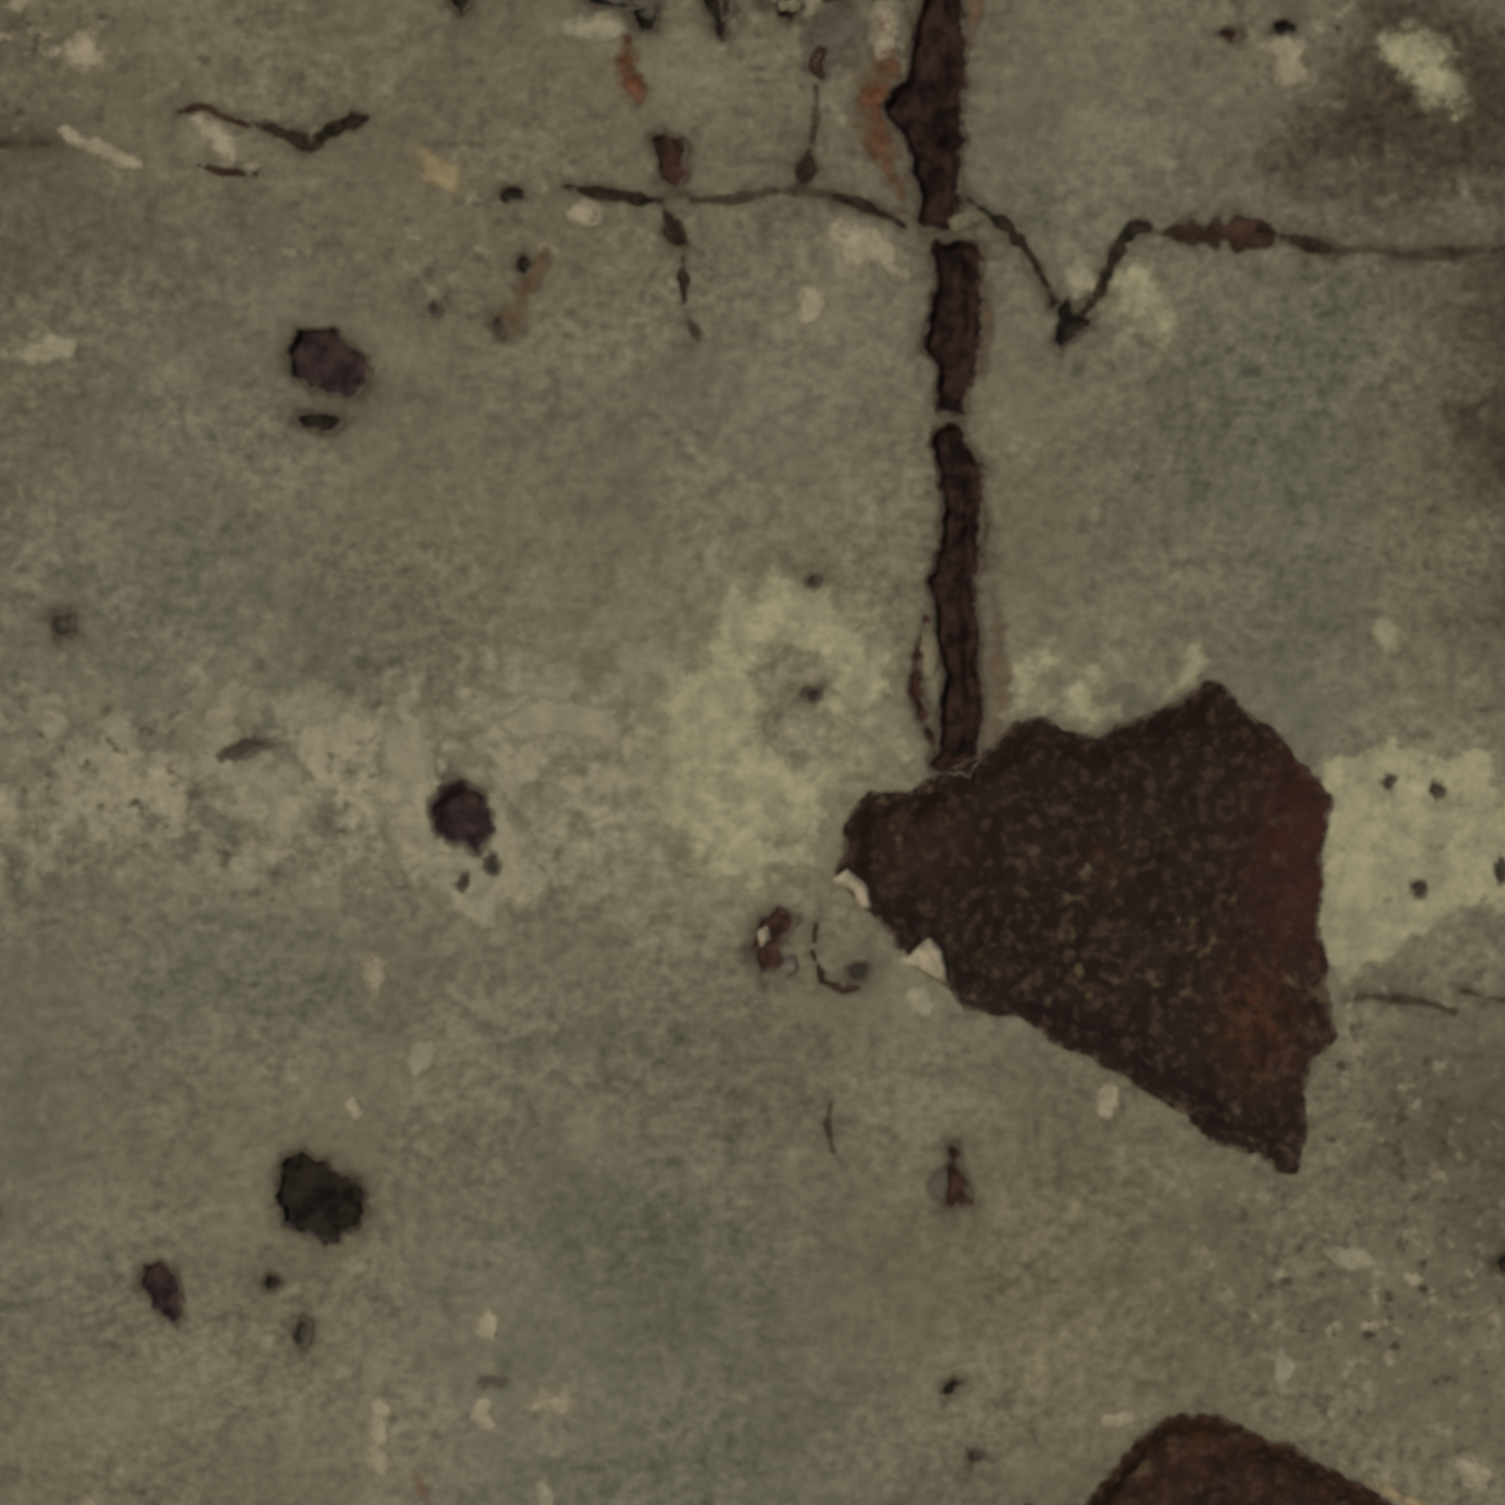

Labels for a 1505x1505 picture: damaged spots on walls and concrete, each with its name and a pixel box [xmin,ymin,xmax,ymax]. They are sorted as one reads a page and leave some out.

crack [197,164,257,176]
crack [177,102,369,152]
spalling [284,326,374,436]
crack [562,0,1333,779]
spalling [426,777,502,894]
spalling [833,680,1338,1175]
spalling [275,1148,370,1247]
spalling [941,1141,974,1211]
spalling [967,1448,984,1465]
spalling [1076,1412,1392,1505]